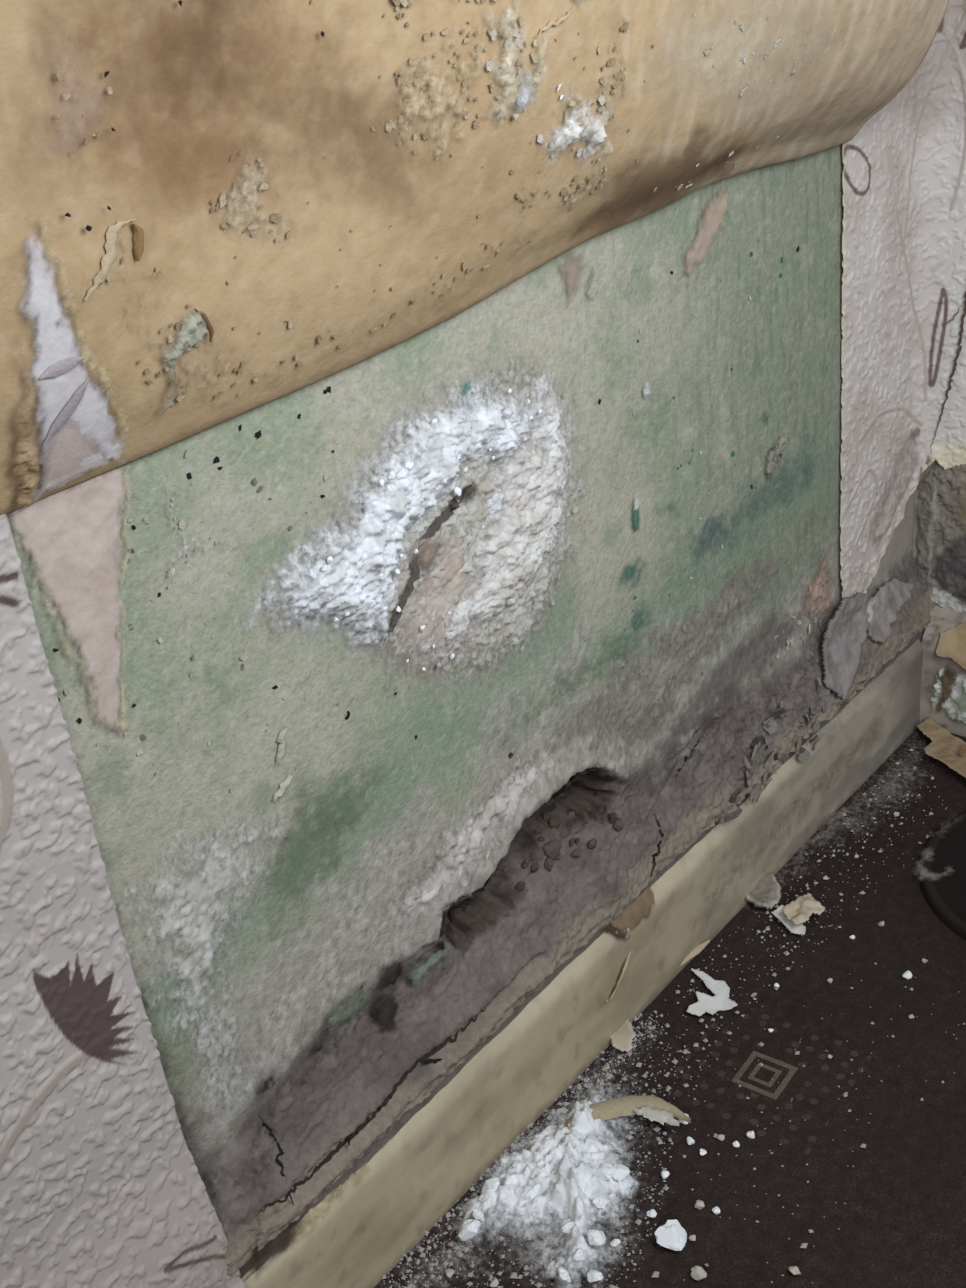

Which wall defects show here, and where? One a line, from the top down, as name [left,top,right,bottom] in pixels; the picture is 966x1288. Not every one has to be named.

peeling [385,6,575,161]
peeling [557,21,629,132]
peeling [685,190,729,275]
flaking render [138,305,214,414]
crack [931,291,966,454]
water stain [255,359,586,684]
water stain [560,562,796,796]
water stain [393,752,555,925]
flaking render [208,464,966,1275]
water stain [119,794,357,1124]
crack [258,1007,486,1213]
water stain [243,1217,301,1278]